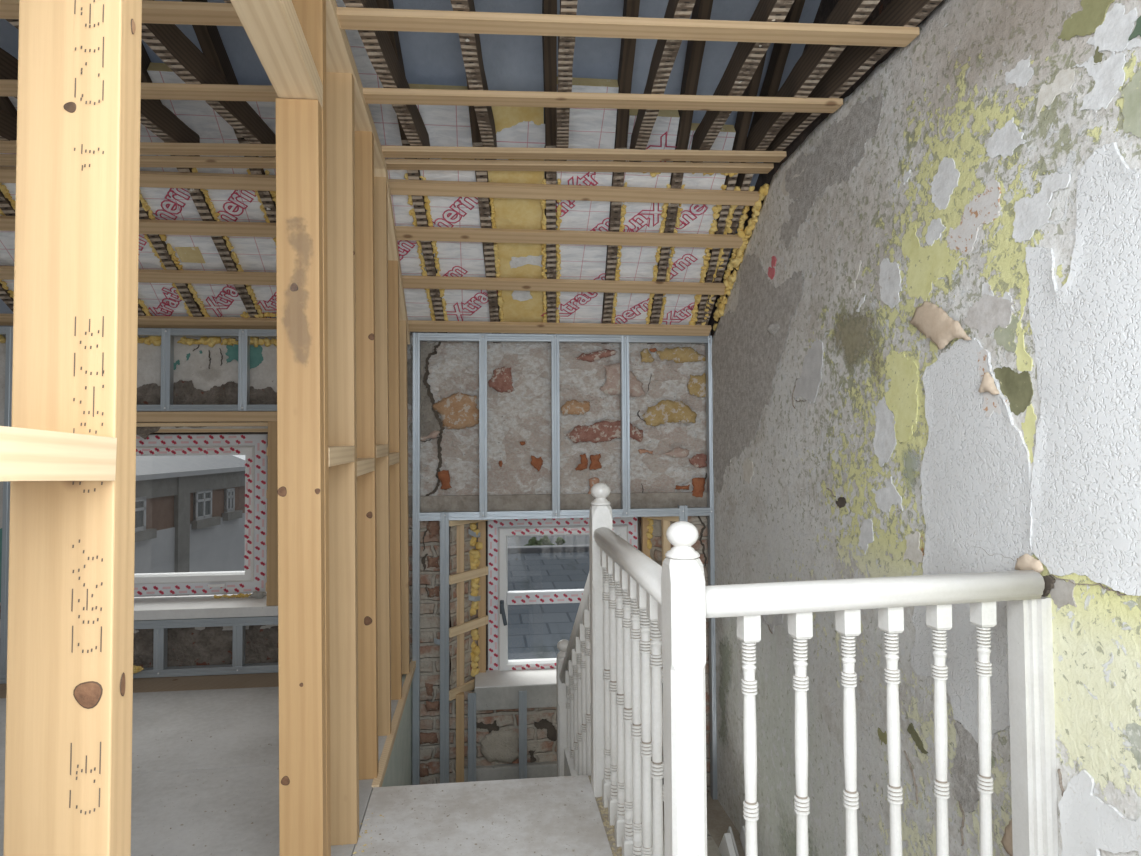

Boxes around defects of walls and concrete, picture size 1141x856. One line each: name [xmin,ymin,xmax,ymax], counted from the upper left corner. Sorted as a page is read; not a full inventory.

peeling [1004,0,1141,138]
peeling [986,117,1026,159]
peeling [879,157,1071,309]
crack [420,342,445,496]
flaking render [407,341,479,441]
flaking render [488,366,515,393]
flaking render [520,441,543,471]
peeling [858,350,920,555]
peeling [963,274,1037,463]
crack [420,530,428,597]
crack [1051,575,1125,596]
peeling [1126,723,1141,770]